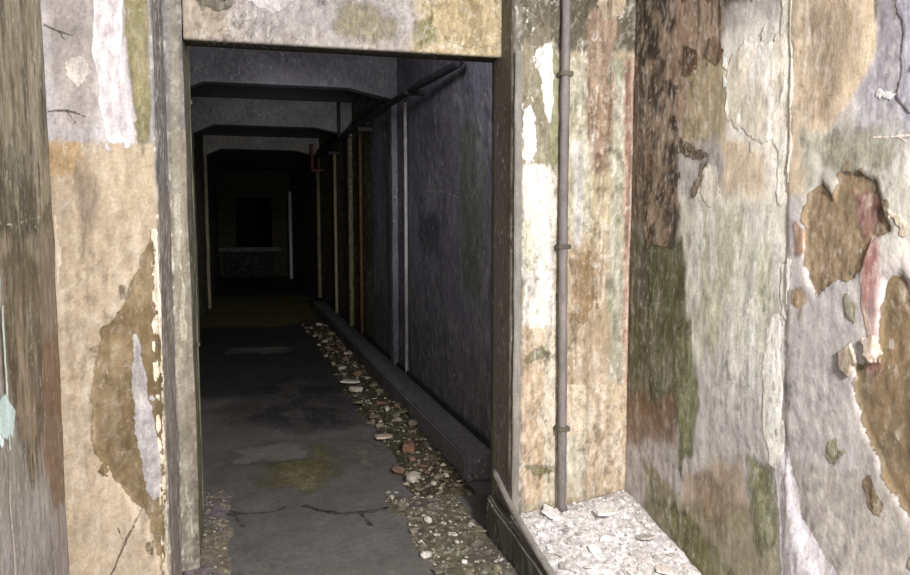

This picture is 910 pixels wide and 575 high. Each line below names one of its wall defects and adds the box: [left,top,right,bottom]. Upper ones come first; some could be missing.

spalling [197,0,235,12]
peeling [248,0,294,13]
flaking render [597,0,626,22]
flaking render [639,0,794,249]
flaking render [90,229,169,575]
leakage [645,202,778,474]
peeling [762,258,792,469]
flaking render [801,160,910,516]
crack [226,505,388,527]